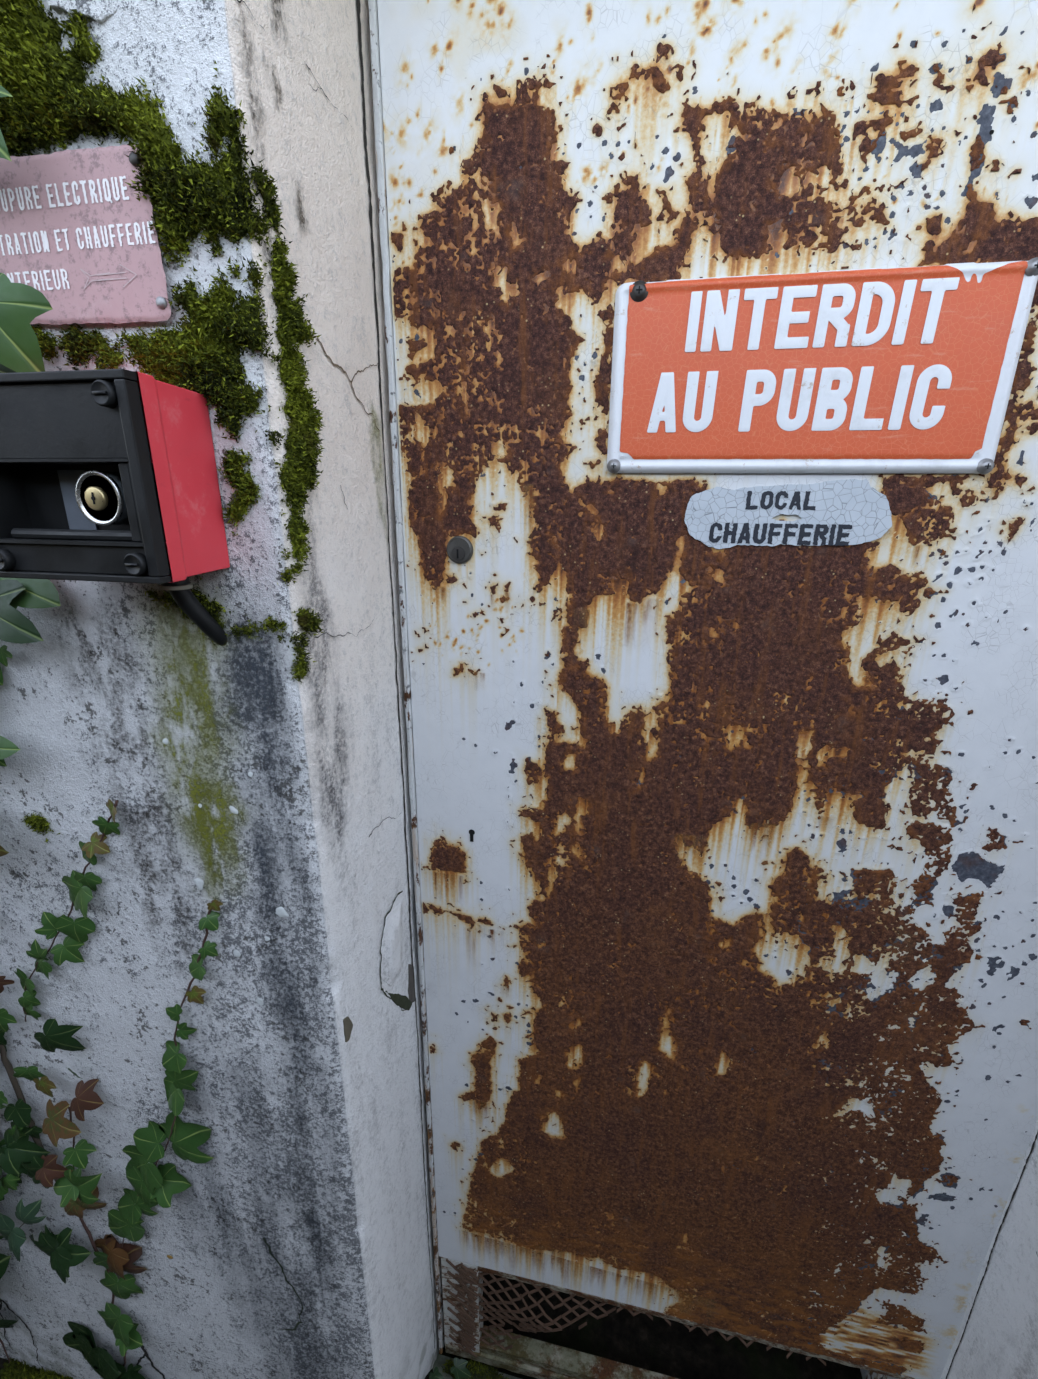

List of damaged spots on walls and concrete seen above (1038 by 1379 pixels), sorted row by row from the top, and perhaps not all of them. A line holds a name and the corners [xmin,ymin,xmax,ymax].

rust [867,60,919,107]
spalling [787,21,1038,272]
rust [917,184,1038,267]
rust [985,280,1038,499]
damp [99,598,295,934]
damp [305,588,347,824]
rust [393,74,985,1375]
damp [267,952,311,1130]
flaking render [380,891,415,1011]
spalling [879,777,1038,1010]
spalling [992,1019,1032,1049]
crack [946,1132,1038,1379]